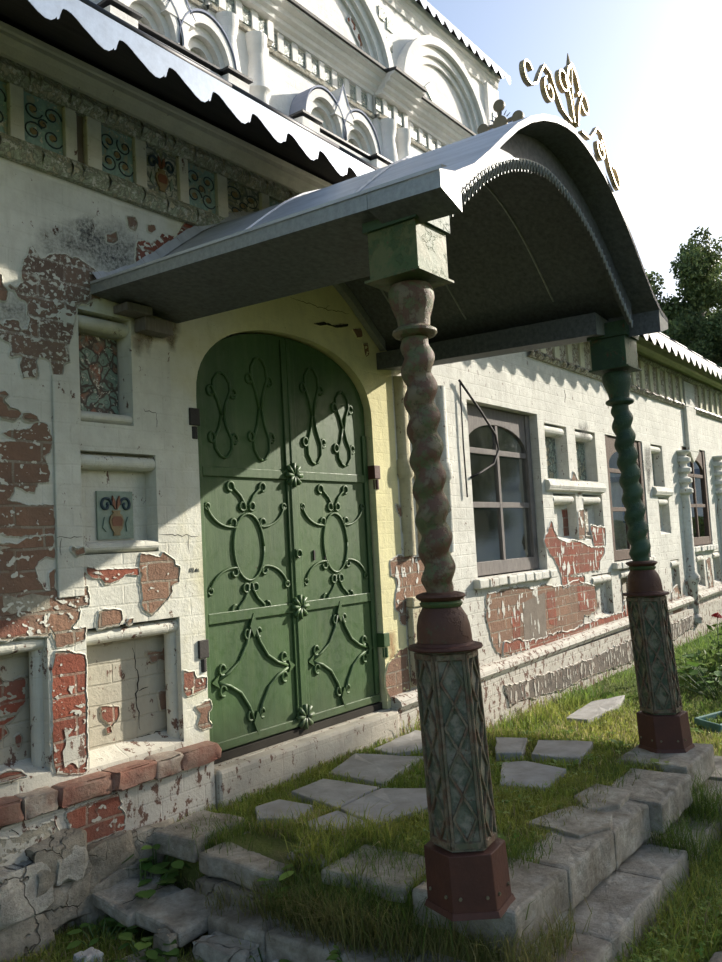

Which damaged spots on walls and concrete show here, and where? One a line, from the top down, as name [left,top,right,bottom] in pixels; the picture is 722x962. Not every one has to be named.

peeling [0,245,107,381]
flaking render [0,389,181,776]
flaking render [389,532,426,626]
flaking render [484,493,628,658]
flaking render [0,768,27,785]
flaking render [0,792,126,886]